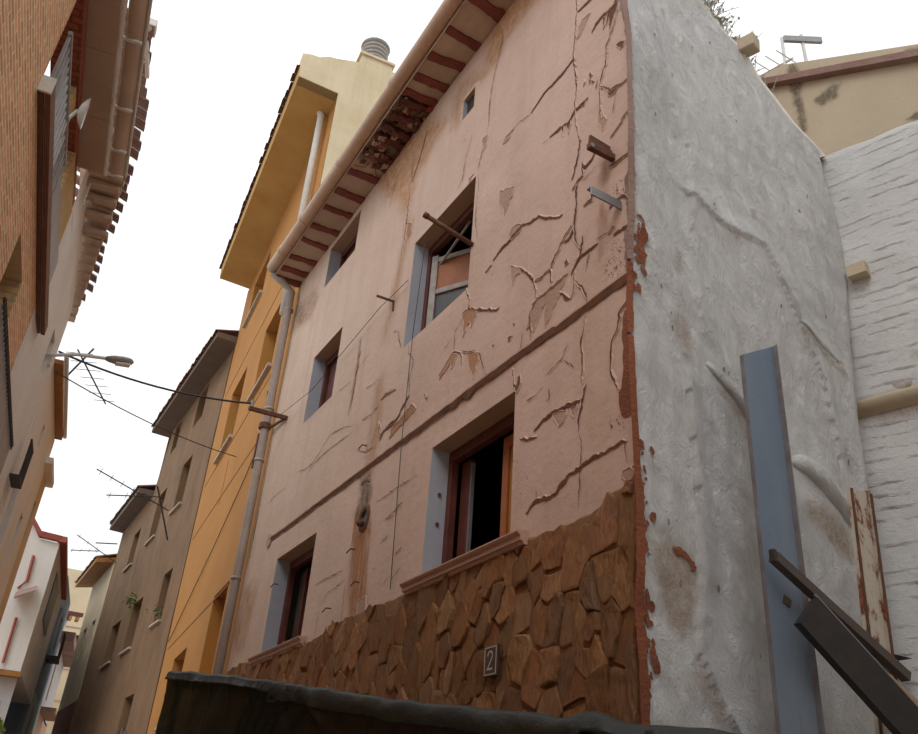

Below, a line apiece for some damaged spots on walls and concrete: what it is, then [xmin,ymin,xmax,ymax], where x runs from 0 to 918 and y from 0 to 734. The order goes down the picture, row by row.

crack [389,131,427,264]
crack [458,0,628,514]
crack [300,330,428,472]
rust [269,274,627,540]
crack [444,288,499,373]
flaking render [601,0,661,725]
crack [372,475,417,581]
spalling [673,546,697,571]